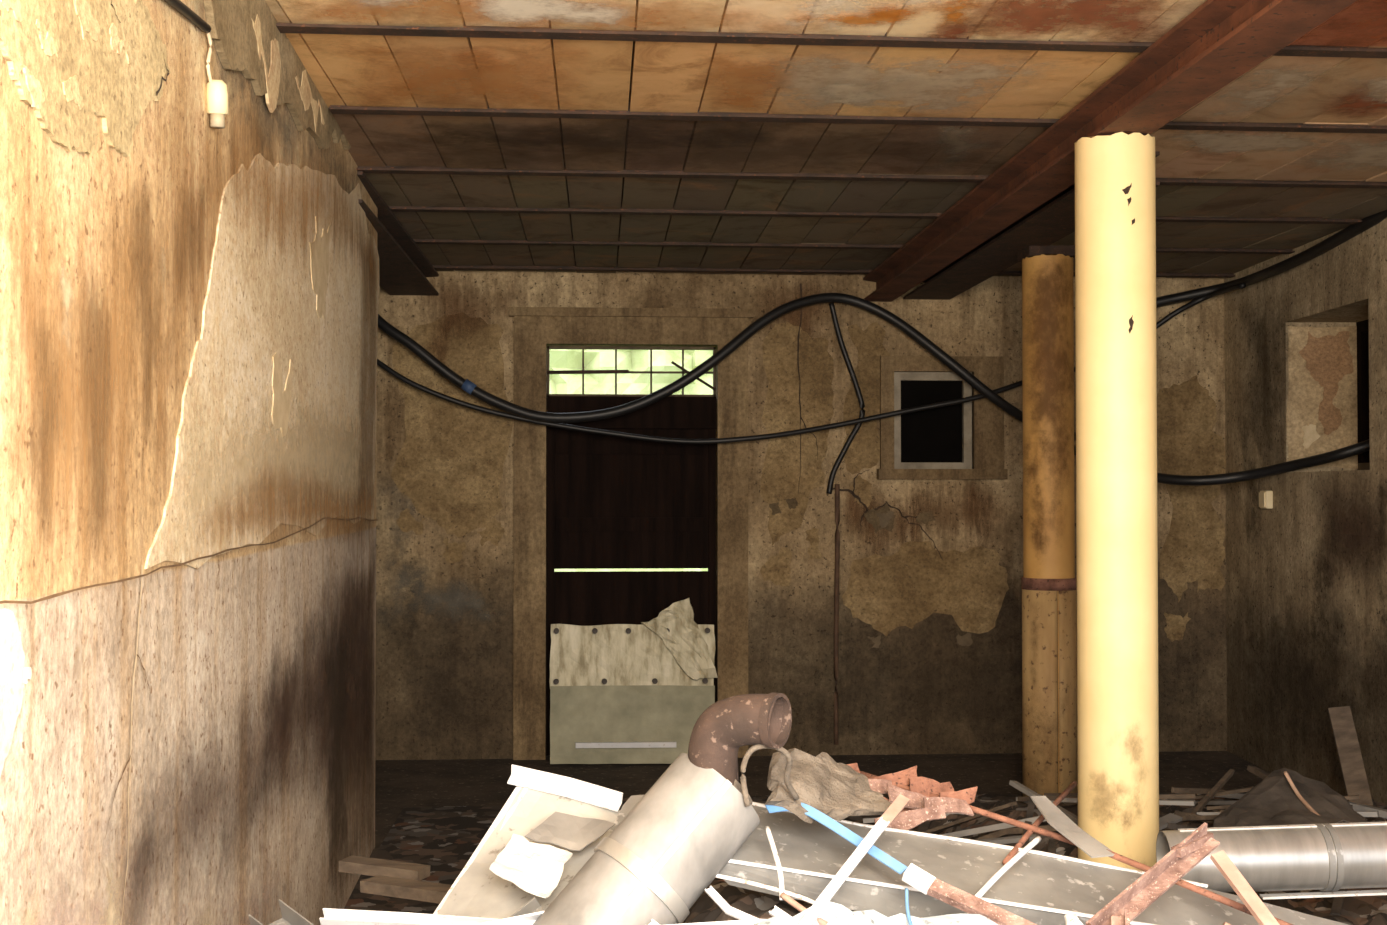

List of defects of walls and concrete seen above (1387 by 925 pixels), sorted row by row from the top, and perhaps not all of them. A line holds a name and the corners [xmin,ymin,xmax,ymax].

spalling [0,0,171,157]
water stain [315,0,706,28]
water stain [716,58,1034,109]
corrosion [935,0,1162,41]
water stain [162,151,235,299]
water stain [23,240,132,536]
flaking render [144,140,513,569]
corrosion [1031,266,1070,469]
peeling [842,541,1009,648]
corrosion [1021,577,1077,591]
peeling [0,608,32,777]
crack [0,517,378,921]